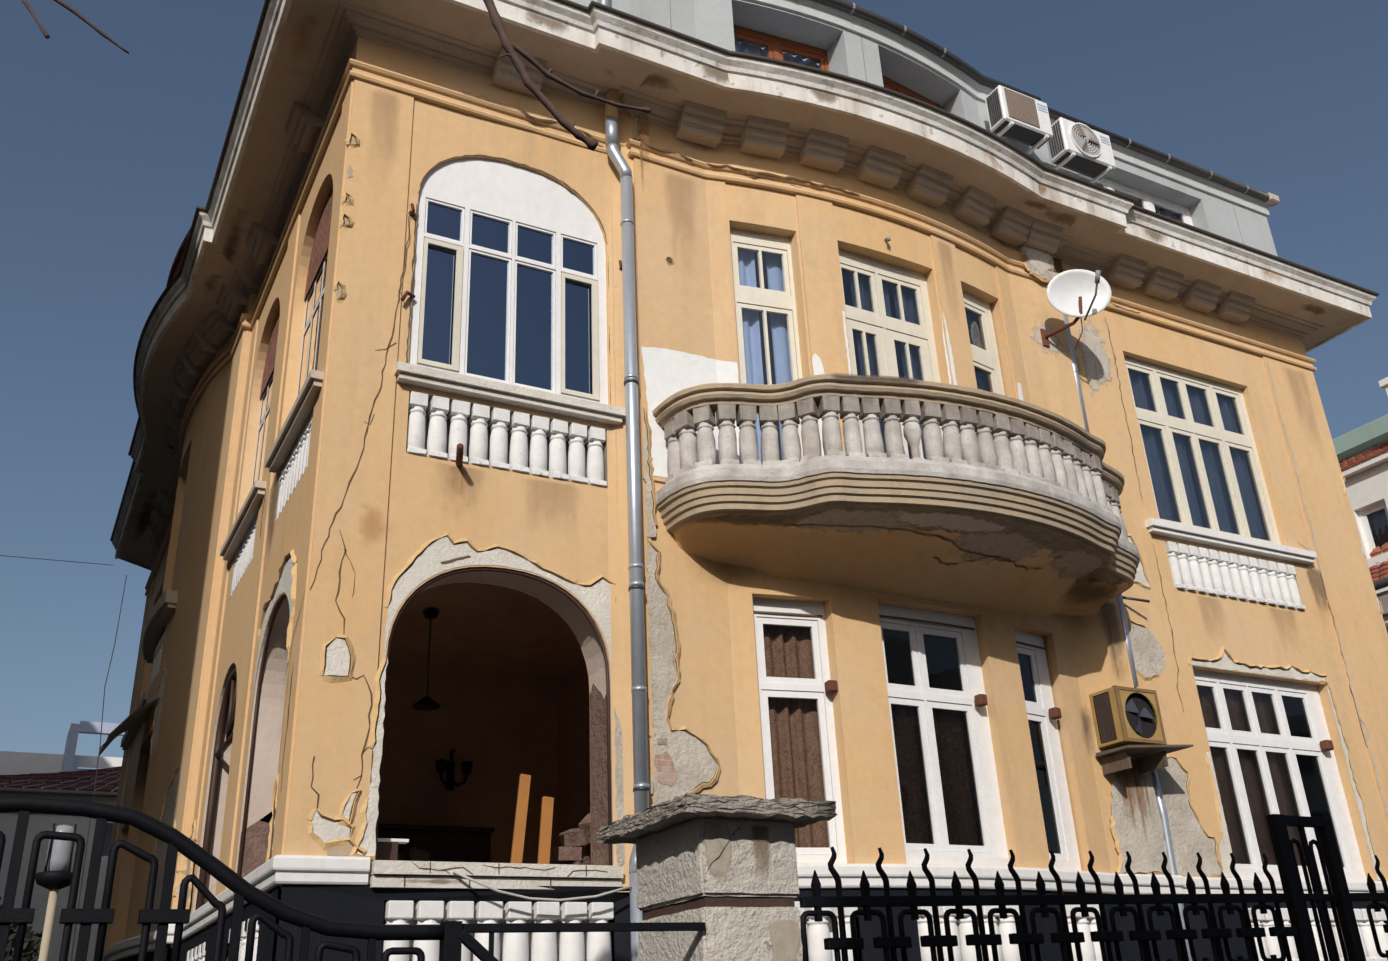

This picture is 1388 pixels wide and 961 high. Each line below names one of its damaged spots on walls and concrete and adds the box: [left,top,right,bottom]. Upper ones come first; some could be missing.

crack [463,91,602,142]
crack [639,130,859,195]
spalling [1023,256,1065,283]
crack [606,325,614,403]
crack [281,154,609,808]
spalling [643,407,721,805]
spalling [793,509,1102,581]
spalling [1128,533,1151,590]
spalling [306,532,616,860]
flaking render [590,684,625,866]
spalling [1110,752,1236,878]
spalling [1188,646,1381,880]